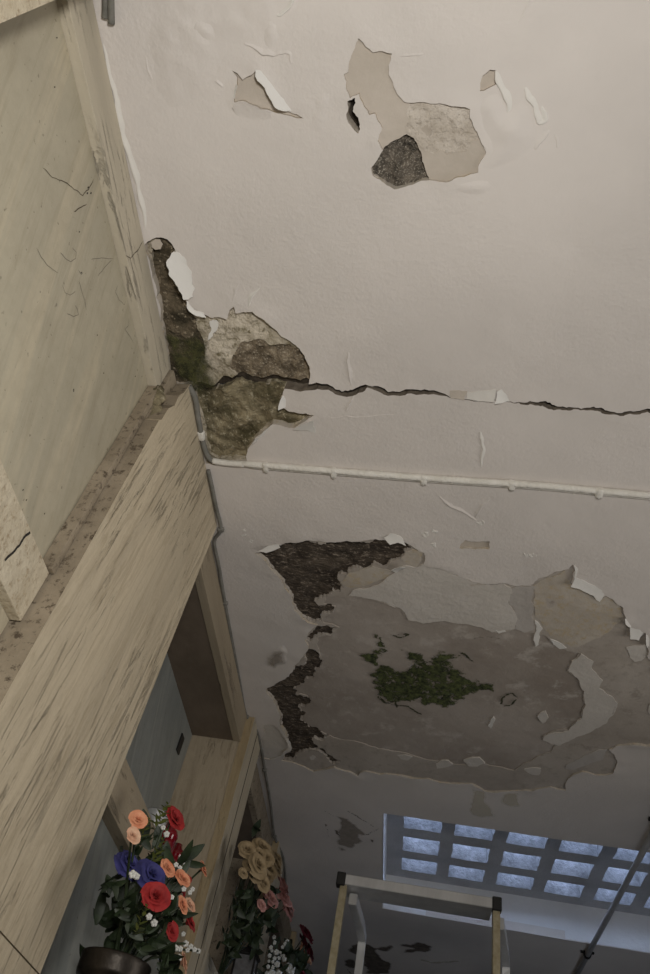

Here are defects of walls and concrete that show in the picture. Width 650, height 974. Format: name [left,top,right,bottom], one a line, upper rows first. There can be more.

peeling [215,70,300,120]
flaking render [345,39,491,194]
flaking render [148,237,316,461]
crack [198,372,309,389]
crack [450,389,509,404]
peeling [258,533,650,816]